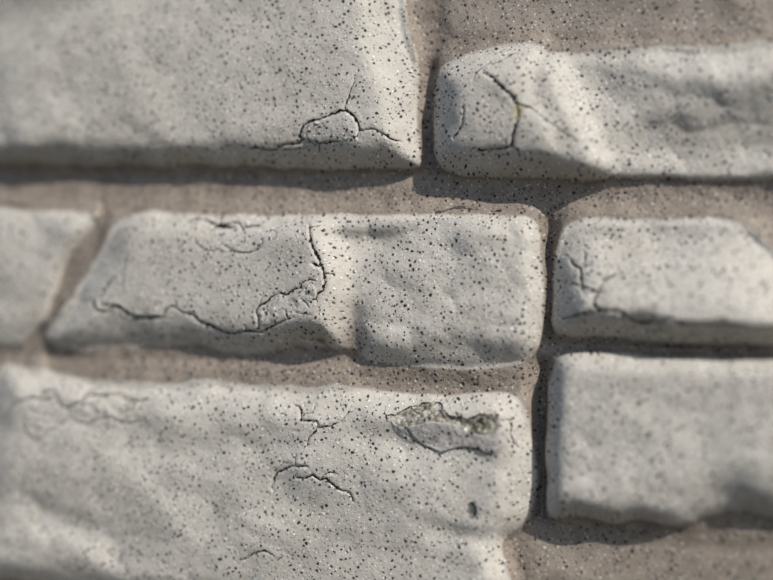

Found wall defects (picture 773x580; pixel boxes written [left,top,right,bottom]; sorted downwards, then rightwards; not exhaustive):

crack [250,77,401,153]
crack [474,54,577,157]
crack [187,216,277,253]
crack [81,225,333,335]
crack [564,254,741,326]
crack [271,405,355,501]
spalling [384,400,509,455]